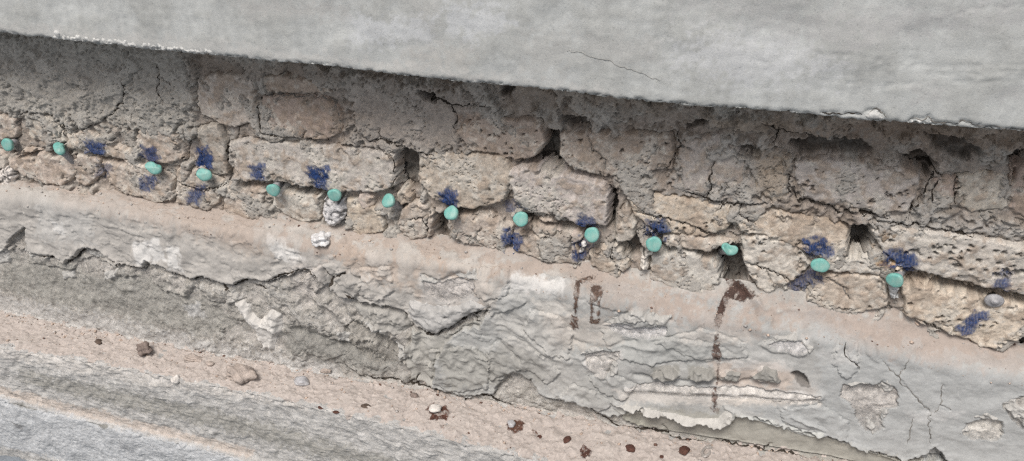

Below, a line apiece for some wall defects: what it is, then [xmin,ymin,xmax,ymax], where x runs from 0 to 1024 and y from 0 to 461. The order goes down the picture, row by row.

crack [15,83,133,136]
crack [155,61,434,205]
crack [637,161,766,234]
crack [787,156,975,238]
crack [42,248,86,264]
spalling [336,320,409,363]
rust [570,276,604,329]
spalling [605,310,672,338]
rust [712,278,755,412]
spalling [625,365,821,403]
spalling [840,380,899,434]
spalling [962,396,1024,440]